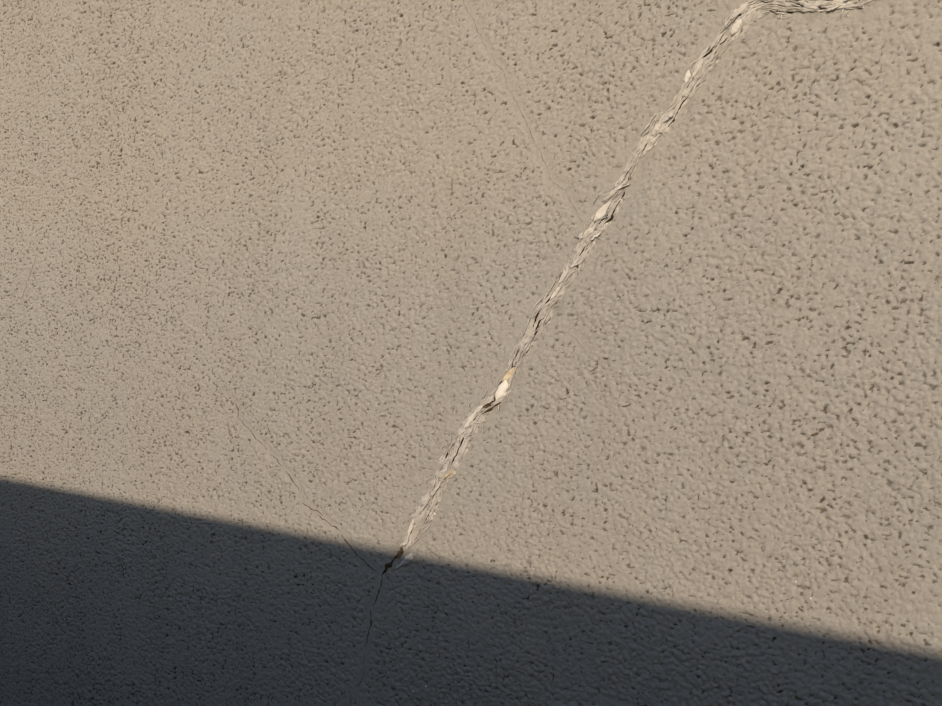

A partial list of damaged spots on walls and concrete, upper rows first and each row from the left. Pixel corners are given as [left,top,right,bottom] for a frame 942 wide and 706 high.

crack [236,0,878,706]